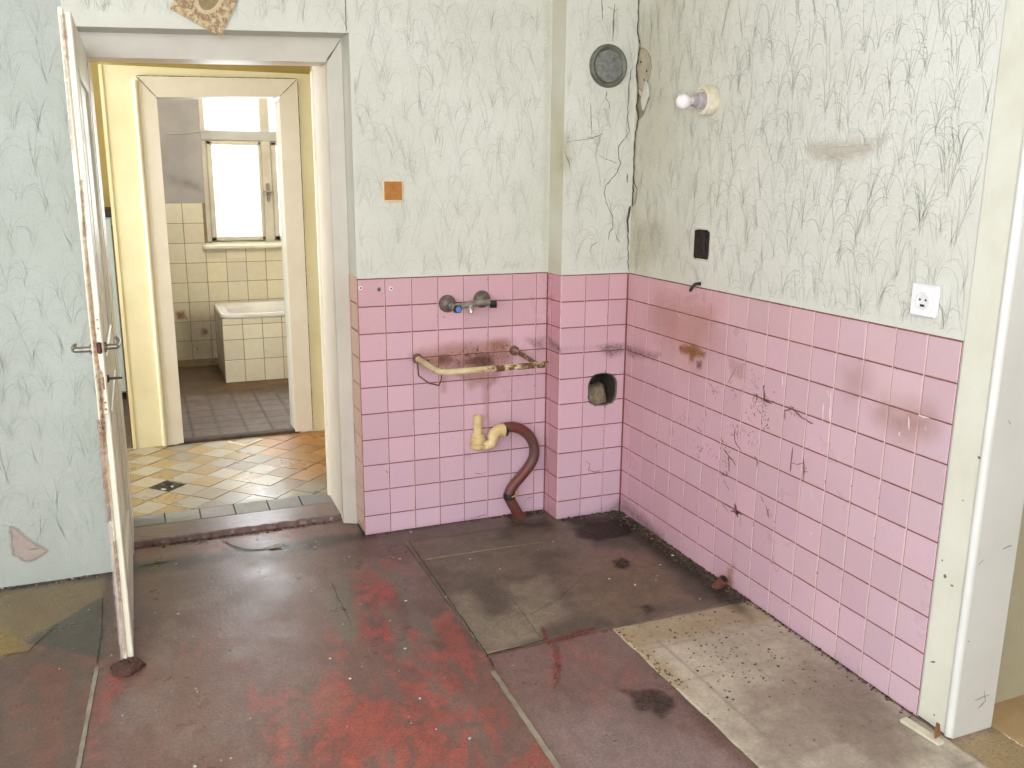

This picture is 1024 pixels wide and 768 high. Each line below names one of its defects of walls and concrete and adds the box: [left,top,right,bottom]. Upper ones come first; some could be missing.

peeling [637,61,649,118]
crack [565,0,640,268]
rust [427,342,510,375]
rust [680,346,703,367]
leakage [624,690,673,717]